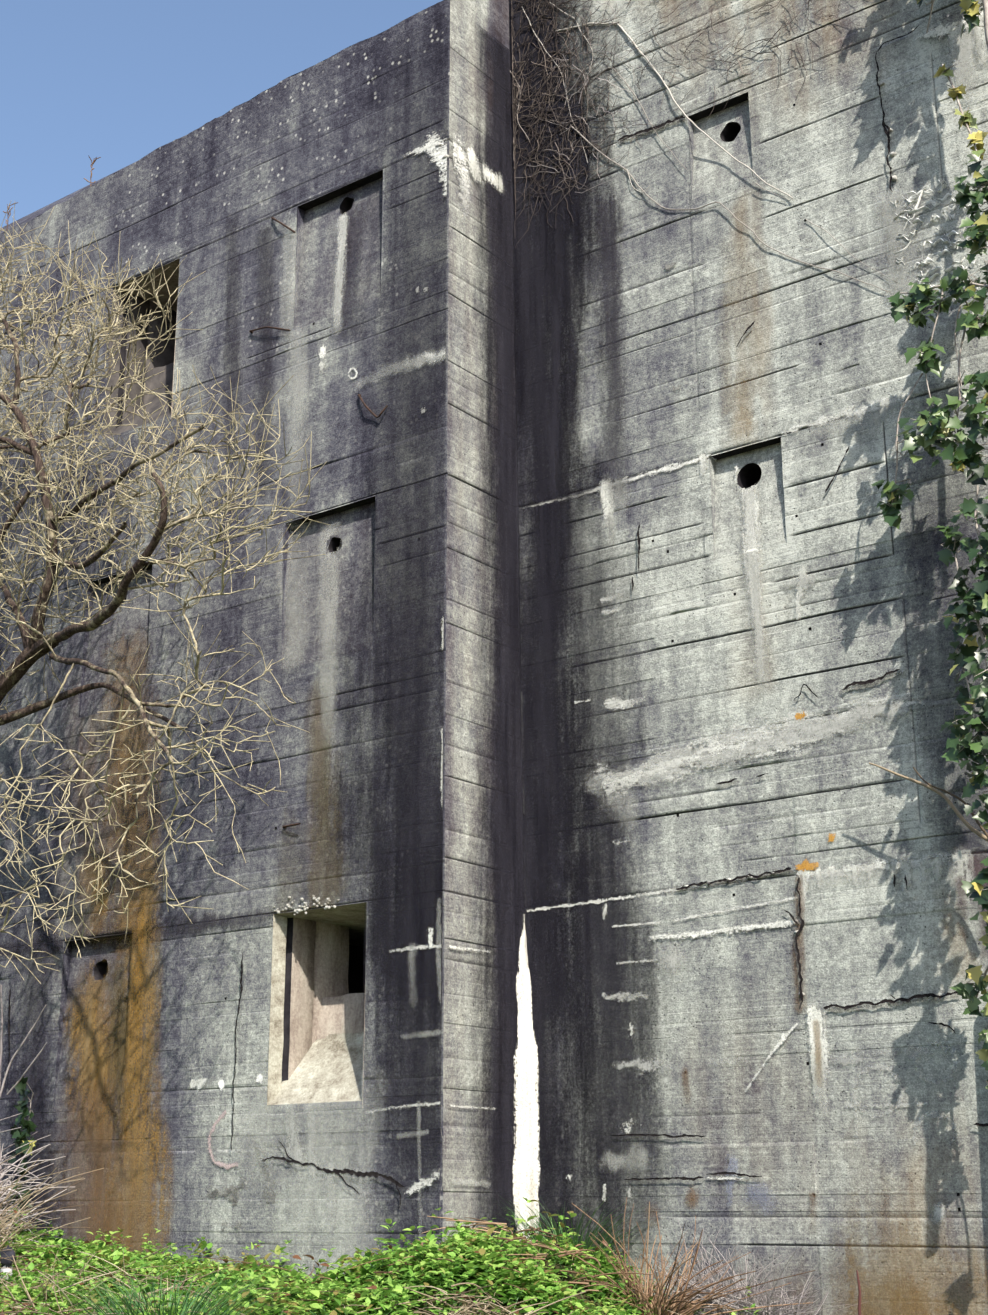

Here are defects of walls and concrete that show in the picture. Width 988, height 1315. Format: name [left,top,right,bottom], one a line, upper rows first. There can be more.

spalling [408,133,503,196]
crack [875,25,919,191]
water stain [318,345,326,373]
water stain [323,0,974,1253]
crack [794,669,901,700]
crack [784,878,958,1033]
rust [66,853,172,1253]
crack [231,953,243,1150]
crack [262,1141,404,1208]